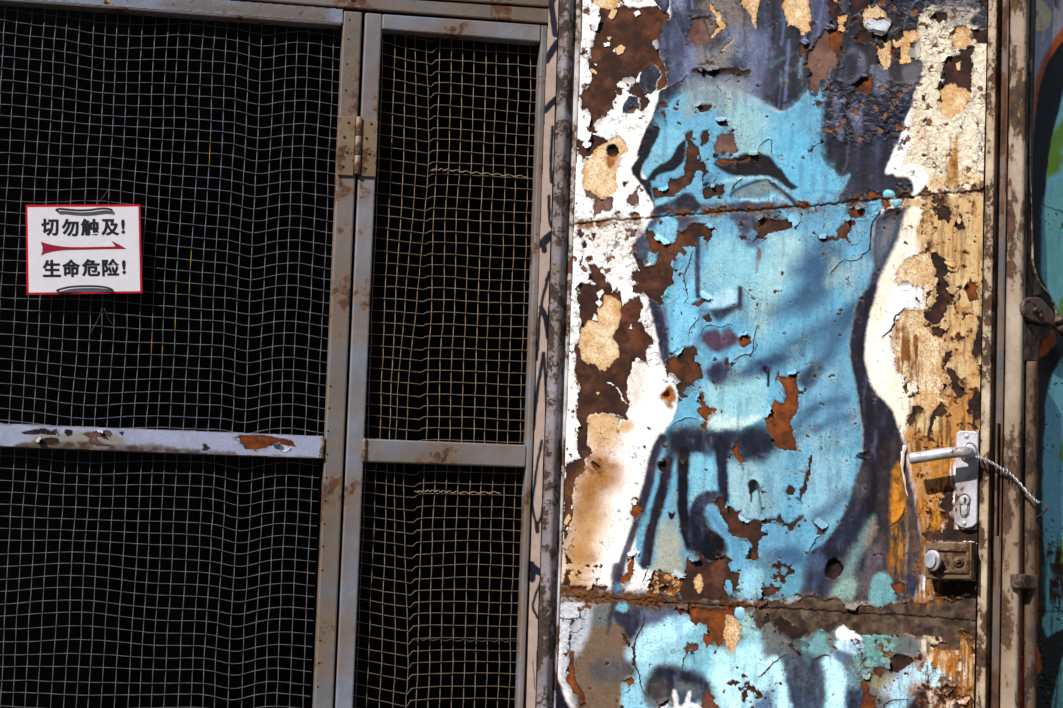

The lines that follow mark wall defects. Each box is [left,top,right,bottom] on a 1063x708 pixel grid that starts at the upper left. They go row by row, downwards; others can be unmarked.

peeling [586,0,619,10]
peeling [834,0,921,70]
peeling [946,21,973,49]
peeling [932,83,971,121]
peeling [582,135,628,199]
peeling [578,295,622,371]
peeling [893,251,947,414]
corrosion [16,427,210,453]
corrosion [232,435,296,452]
corrosion [765,368,801,451]
corrosion [561,455,828,654]
peeling [723,615,743,654]